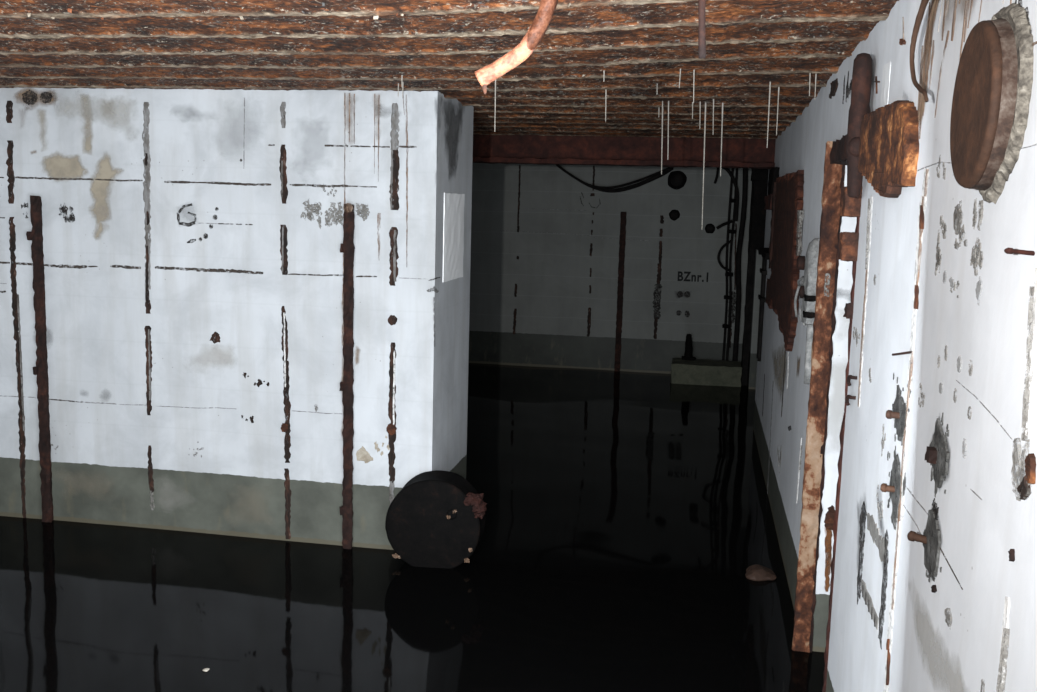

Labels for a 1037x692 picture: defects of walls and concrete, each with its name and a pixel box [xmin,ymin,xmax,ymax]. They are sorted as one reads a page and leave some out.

damp [44,97,118,238]
corrosion [824,505,835,592]